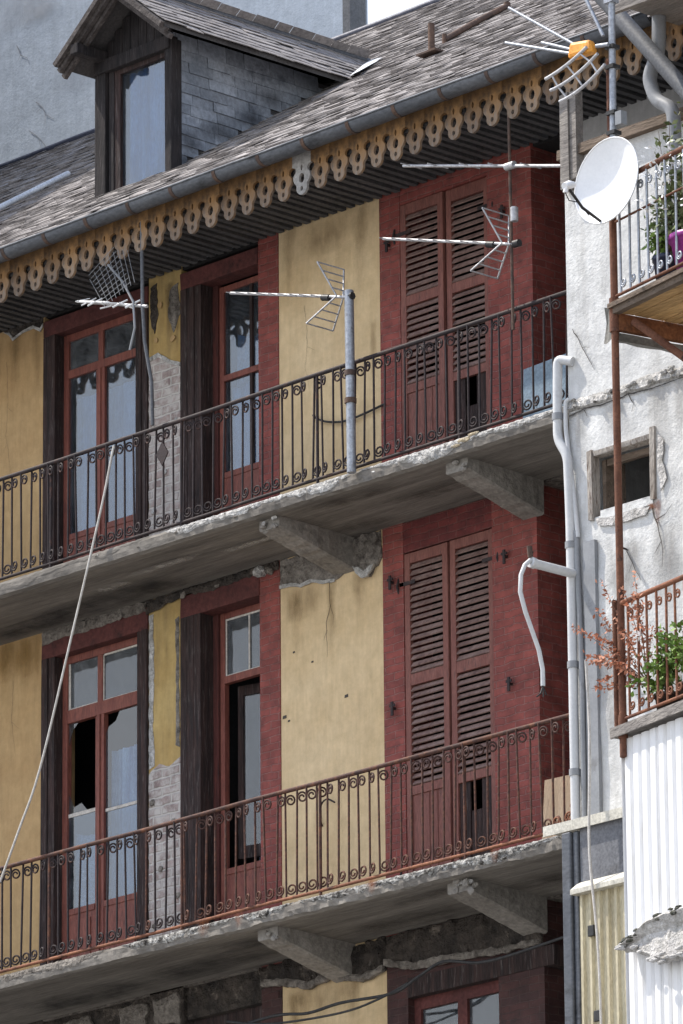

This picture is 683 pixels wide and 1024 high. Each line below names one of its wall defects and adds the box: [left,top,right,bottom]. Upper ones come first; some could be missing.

flaking render [0,283,563,590]
flaking render [0,530,561,990]